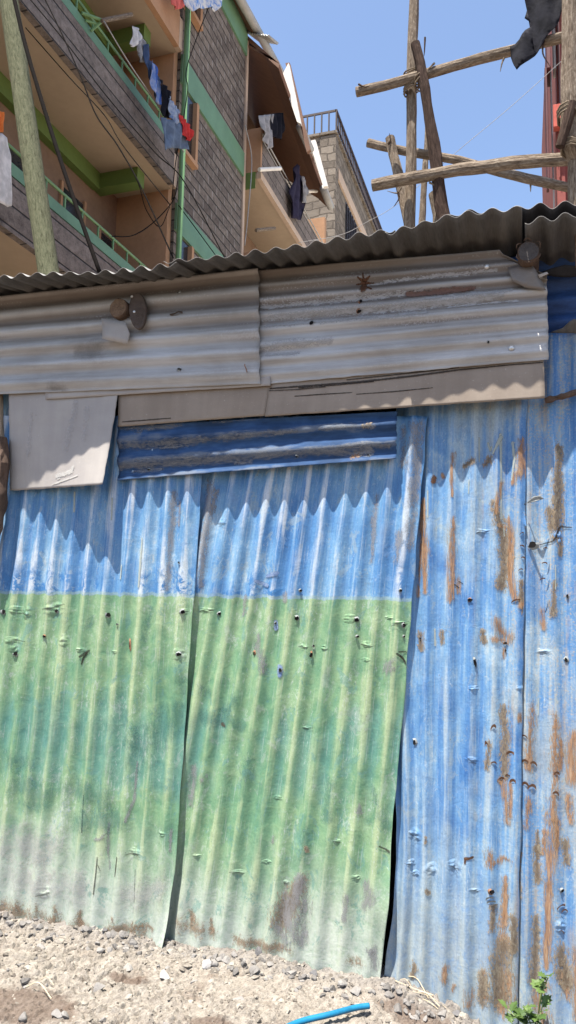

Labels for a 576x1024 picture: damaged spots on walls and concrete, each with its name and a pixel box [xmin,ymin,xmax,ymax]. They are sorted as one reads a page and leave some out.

corrosion [405,286,476,297]
corrosion [445,516,461,604]
corrosion [430,451,495,497]
corrosion [488,435,526,615]
corrosion [544,443,566,557]
corrosion [539,580,559,631]
corrosion [441,700,576,1024]